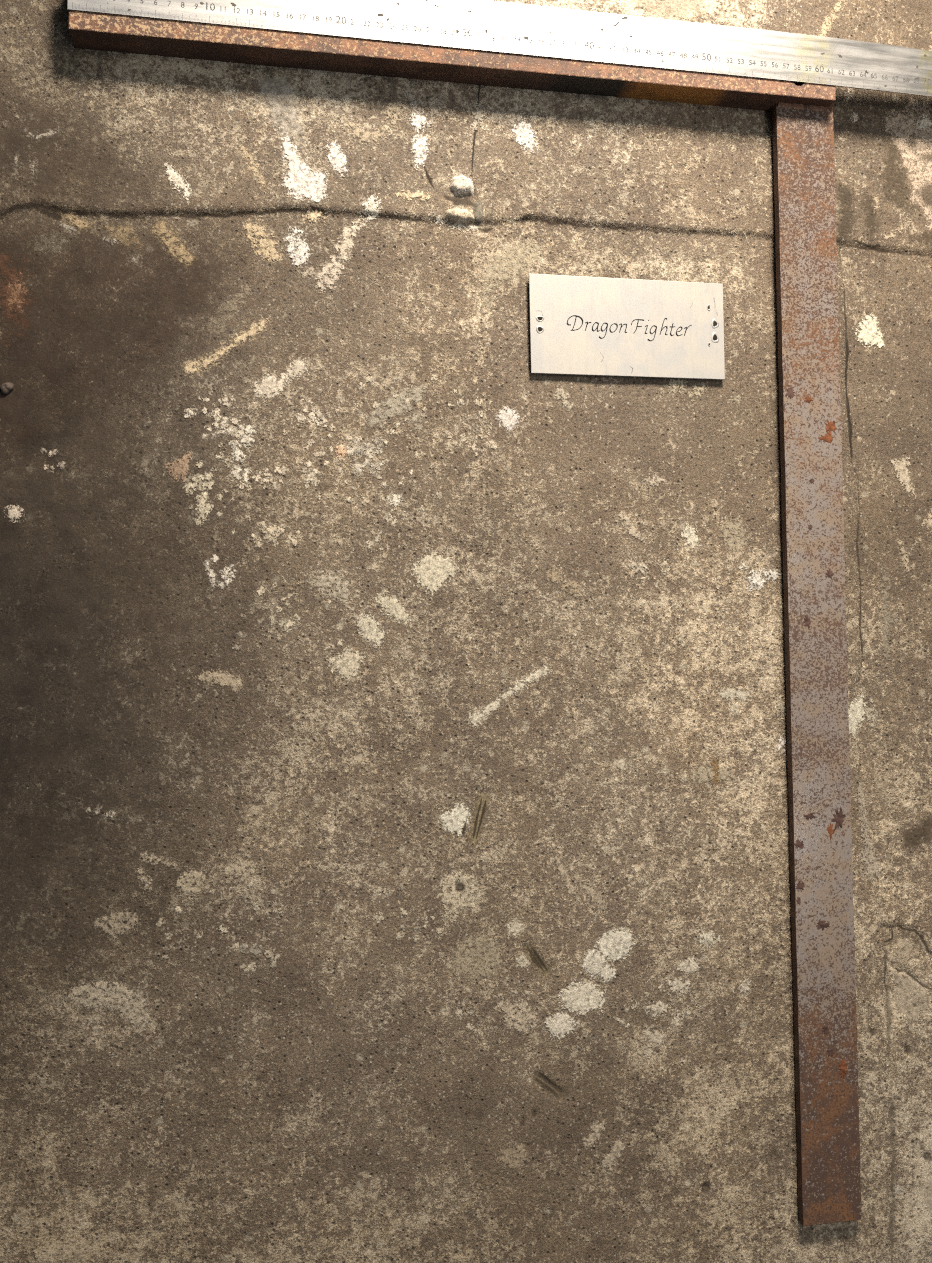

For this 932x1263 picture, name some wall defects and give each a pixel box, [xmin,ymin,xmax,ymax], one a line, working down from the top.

crack [472,85,480,169]
crack [0,204,328,220]
crack [359,214,632,232]
crack [840,240,932,256]
crack [843,283,858,475]
crack [855,508,863,654]
crack [880,924,932,990]